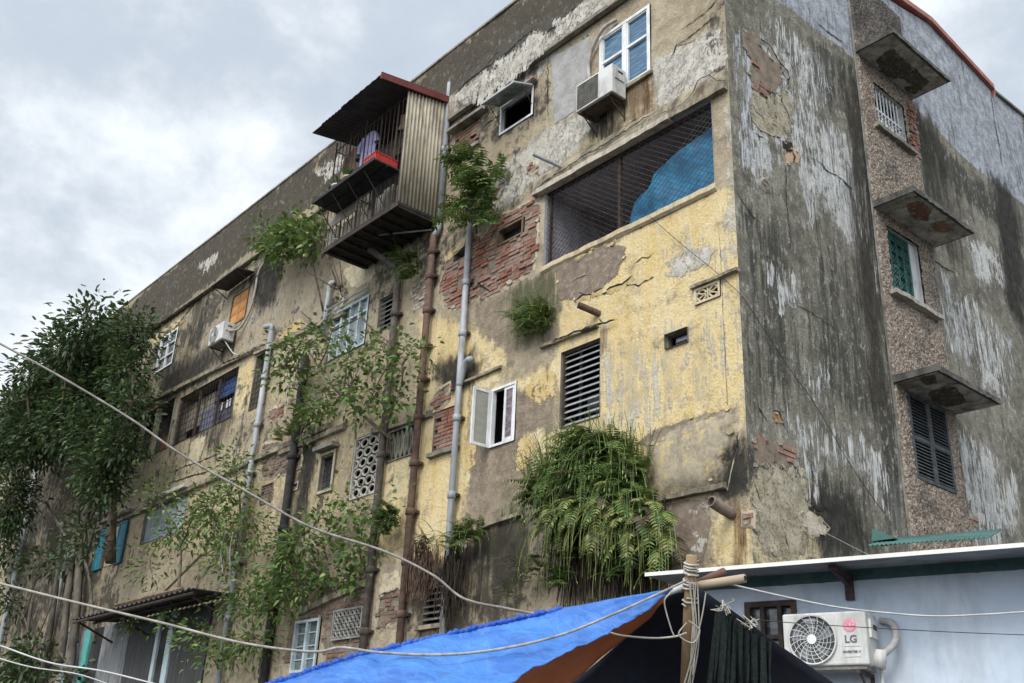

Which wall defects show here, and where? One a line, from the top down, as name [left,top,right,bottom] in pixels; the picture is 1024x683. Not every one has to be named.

peeling [199,252,218,276]
leakage [433,351,481,395]
flaking render [410,0,605,314]
crack [552,239,654,342]
leakage [733,33,755,169]
peeling [740,28,801,168]
leakage [762,12,886,408]
peeling [876,48,930,160]
efflorescence [939,265,1015,401]
leakage [992,176,1024,325]
peeling [741,433,831,563]
efflorescence [958,429,1021,546]